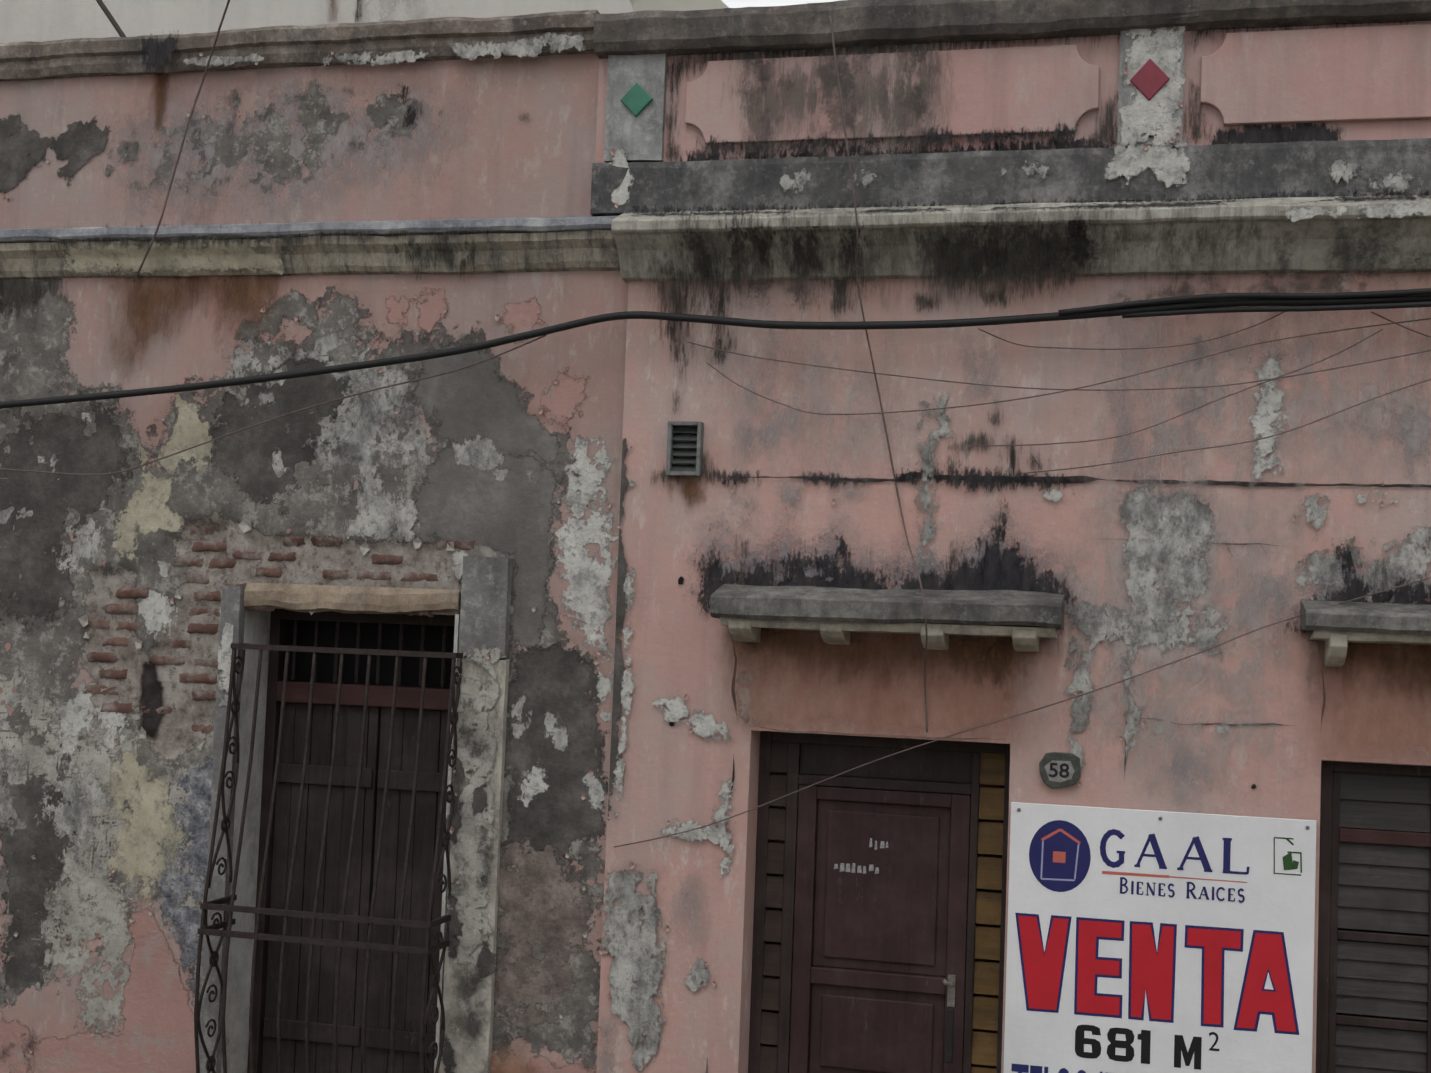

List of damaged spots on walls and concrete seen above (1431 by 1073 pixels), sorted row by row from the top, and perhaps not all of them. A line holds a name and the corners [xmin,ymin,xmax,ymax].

damp [0,84,429,202]
damp [666,37,1118,162]
peeling [1284,159,1431,222]
damp [626,189,1431,373]
damp [653,449,761,501]
damp [692,394,1077,613]
peeling [1247,351,1290,480]
spalling [0,240,670,1073]
peeling [652,694,732,743]
peeling [1063,483,1229,786]
damp [1286,522,1431,634]
peeling [659,778,736,877]